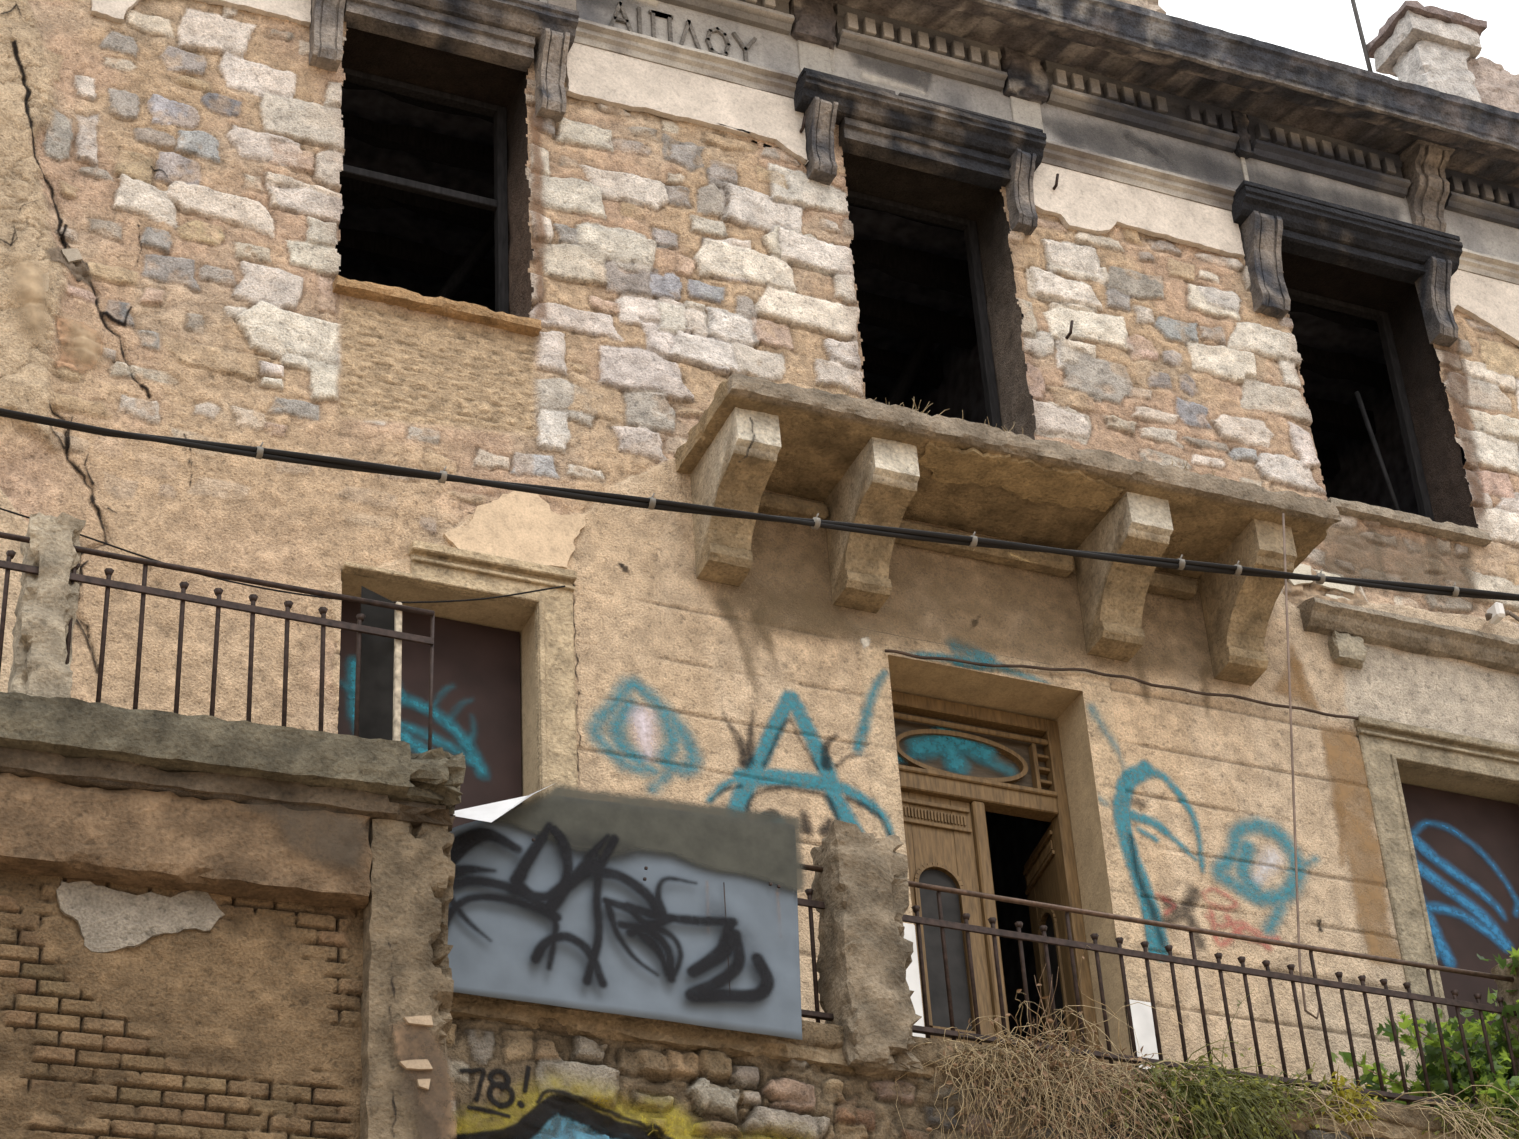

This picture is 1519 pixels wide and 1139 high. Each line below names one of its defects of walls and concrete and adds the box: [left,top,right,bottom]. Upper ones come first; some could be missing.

crack [0,4,150,398]
spalling [48,248,91,285]
flaking render [1450,270,1519,347]
crack [50,405,117,674]
flaking render [442,491,586,569]
flaking render [56,881,225,953]